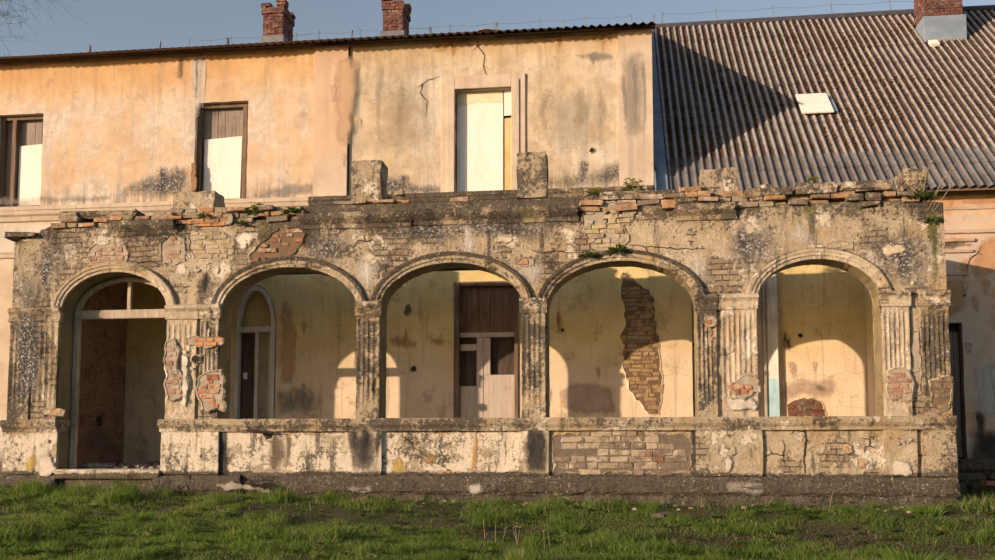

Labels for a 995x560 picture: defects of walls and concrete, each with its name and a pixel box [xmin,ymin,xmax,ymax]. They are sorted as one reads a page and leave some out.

spalling [159,211,307,274]
peeling [946,239,995,315]
spalling [163,336,227,414]
peeling [550,368,614,413]
spalling [618,272,664,416]
spalling [703,315,718,329]
spalling [785,363,834,417]
spalling [885,331,954,413]
water stain [973,362,995,458]
water stain [348,430,380,469]
water stain [525,430,544,471]
crack [764,430,810,471]